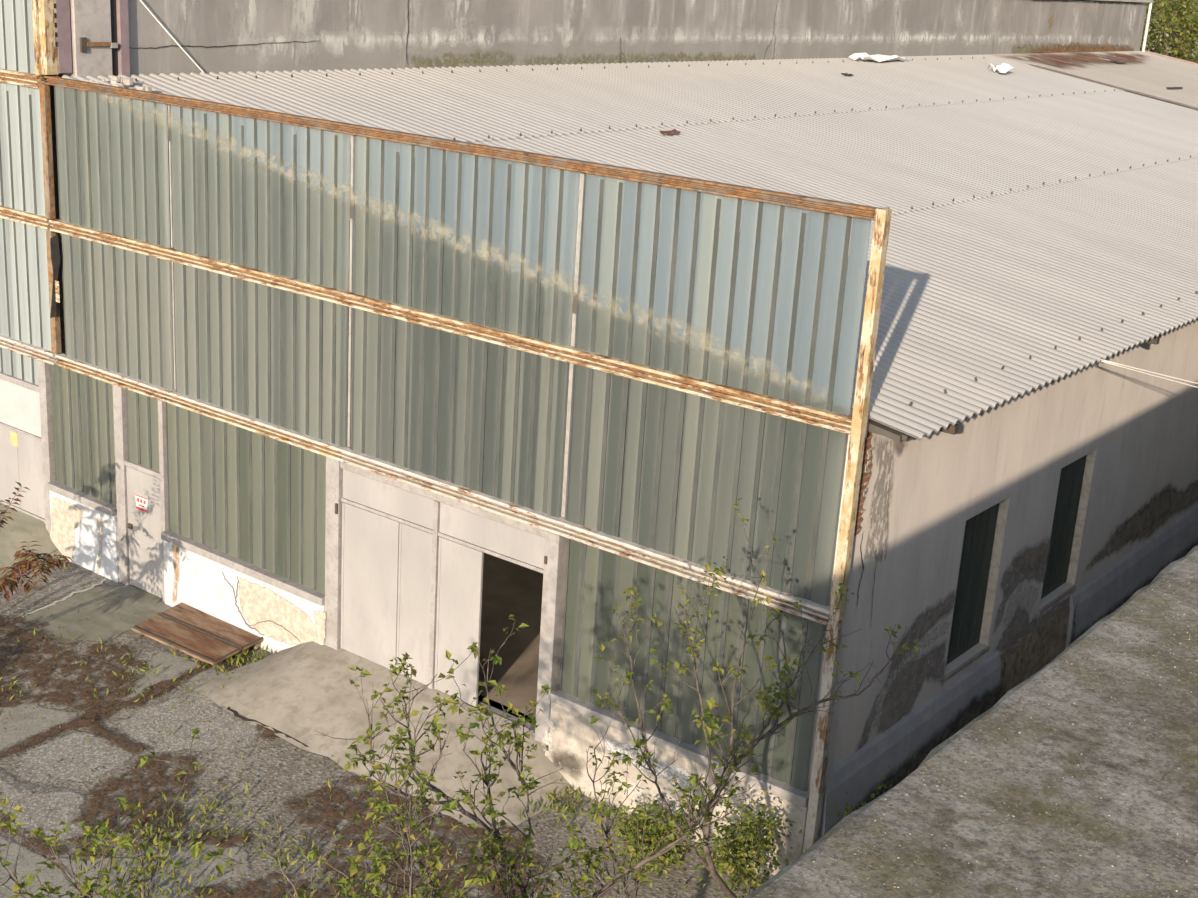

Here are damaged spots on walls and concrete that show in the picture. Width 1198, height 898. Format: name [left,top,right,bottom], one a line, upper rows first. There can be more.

corrosion [1012,43,1198,109]
peeling [50,496,103,574]
peeling [854,432,893,559]
leakage [1090,481,1198,566]
crack [222,572,301,643]
leakage [858,593,955,749]
leakage [995,541,1070,651]
spalling [999,606,1070,693]